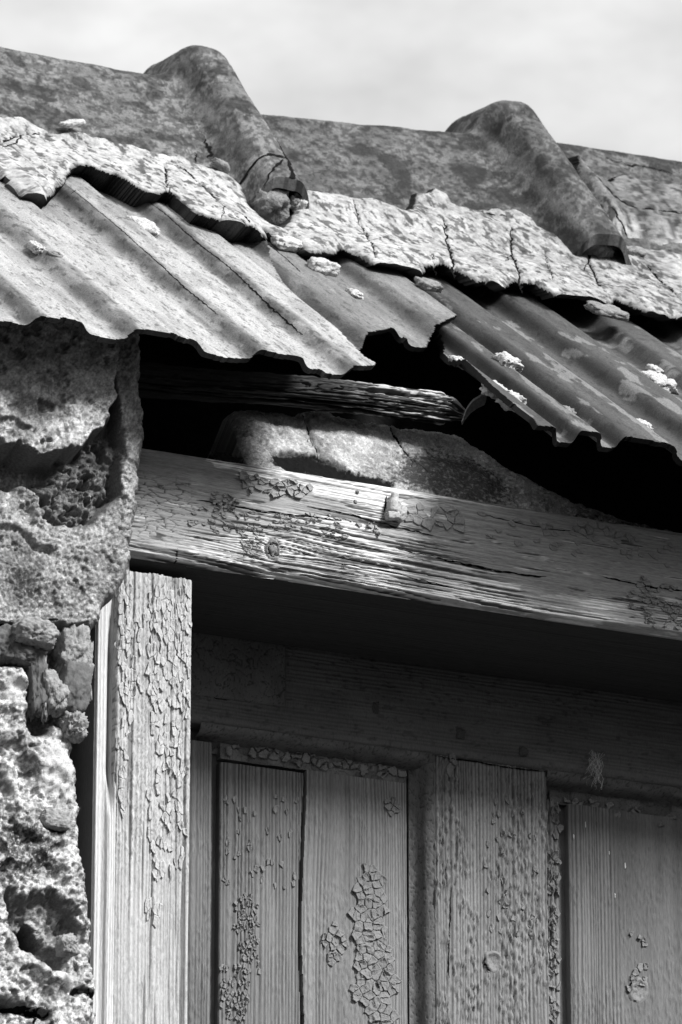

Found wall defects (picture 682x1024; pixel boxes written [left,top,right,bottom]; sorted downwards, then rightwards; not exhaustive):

crack [151,139,303,335]
crack [353,200,395,258]
crack [432,221,456,278]
crack [480,211,523,293]
crack [583,255,601,286]
peeling [188,470,381,559]
peeling [404,501,465,533]
peeling [114,583,192,882]
peeling [225,744,407,779]
peeling [145,895,163,929]
peeling [219,893,262,1022]
peeling [321,863,402,1024]